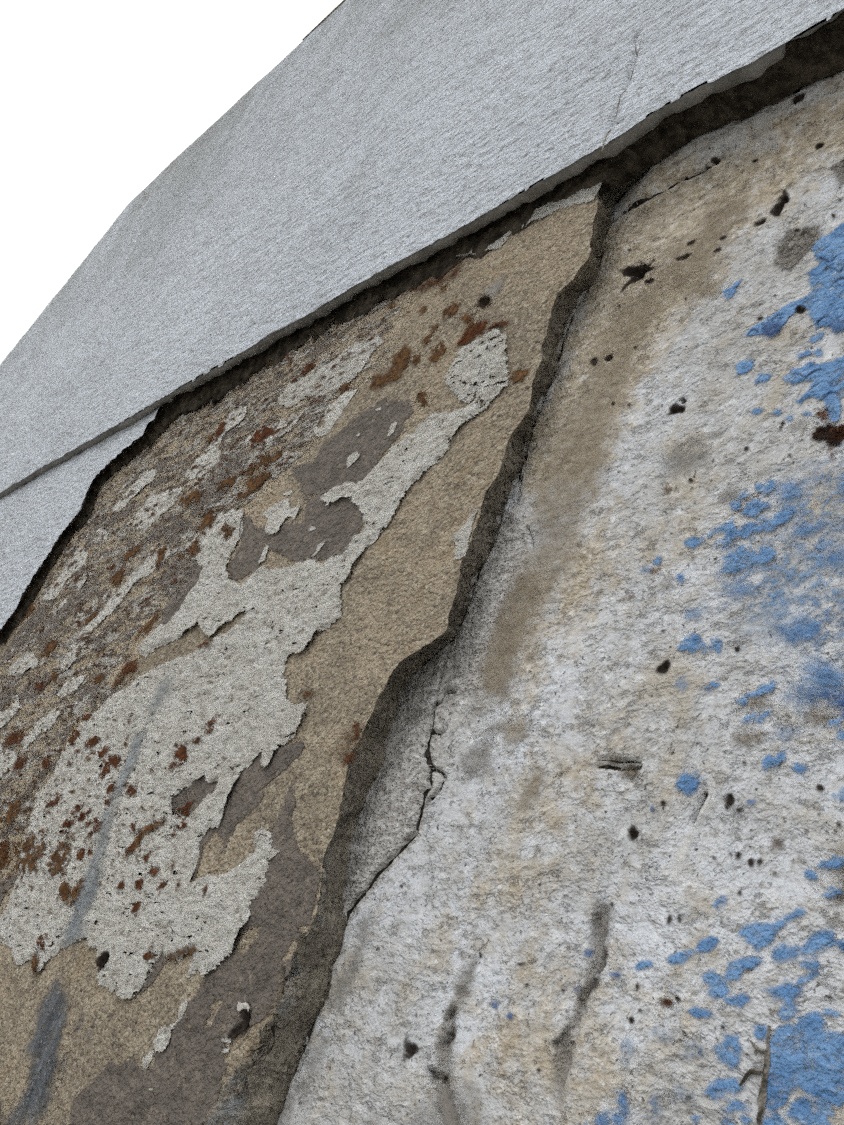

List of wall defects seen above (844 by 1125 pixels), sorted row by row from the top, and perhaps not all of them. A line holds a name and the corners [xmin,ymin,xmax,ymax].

crack [613,171,706,223]
corrosion [369,262,509,390]
corrosion [811,407,844,457]
peeling [244,449,304,483]
corrosion [0,302,395,917]
peeling [0,645,47,694]
peeling [20,672,51,700]
crack [347,639,456,921]
crack [598,760,642,778]
peeling [266,879,298,914]
corrosion [143,943,197,960]
crack [303,1024,315,1051]